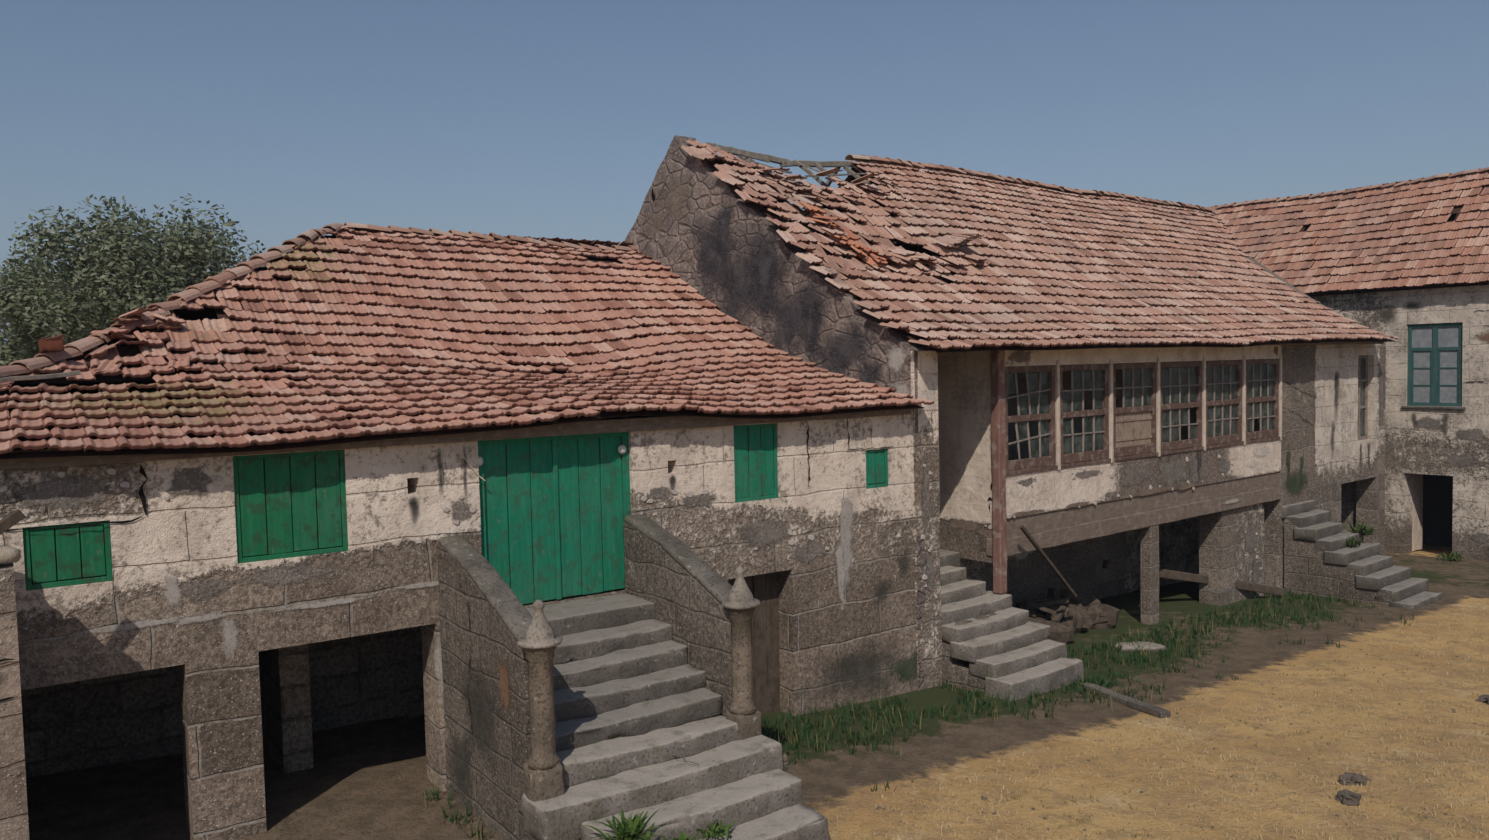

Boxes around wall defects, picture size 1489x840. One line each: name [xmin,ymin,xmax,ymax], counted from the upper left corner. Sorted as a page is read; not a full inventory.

crack [130,465,148,521]
peeling [164,458,224,500]
leakage [835,497,854,610]